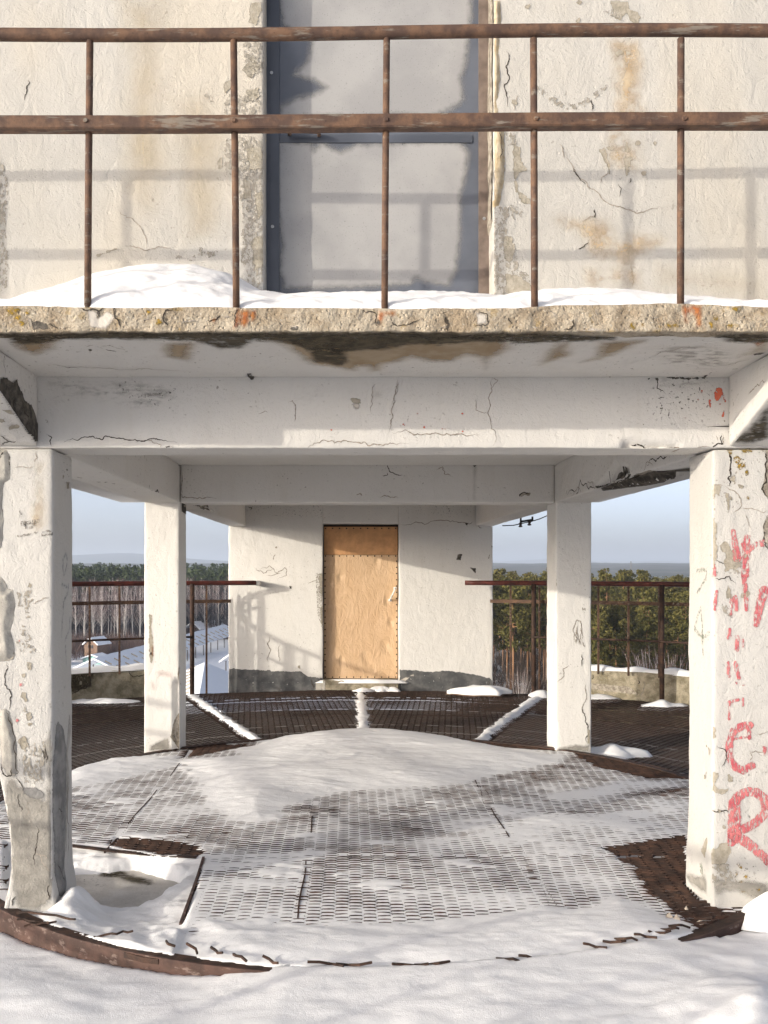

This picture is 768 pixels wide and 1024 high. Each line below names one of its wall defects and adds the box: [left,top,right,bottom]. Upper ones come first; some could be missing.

crack [504,53,519,110]
peeling [217,136,265,287]
peeling [494,132,531,295]
corrosion [234,307,254,328]
water stain [0,331,635,368]
corrosion [684,306,700,325]
water stain [718,334,768,343]
spalling [0,366,38,445]
crack [15,435,177,468]
crack [313,378,498,498]
spalling [595,466,690,491]
peeling [6,583,53,908]